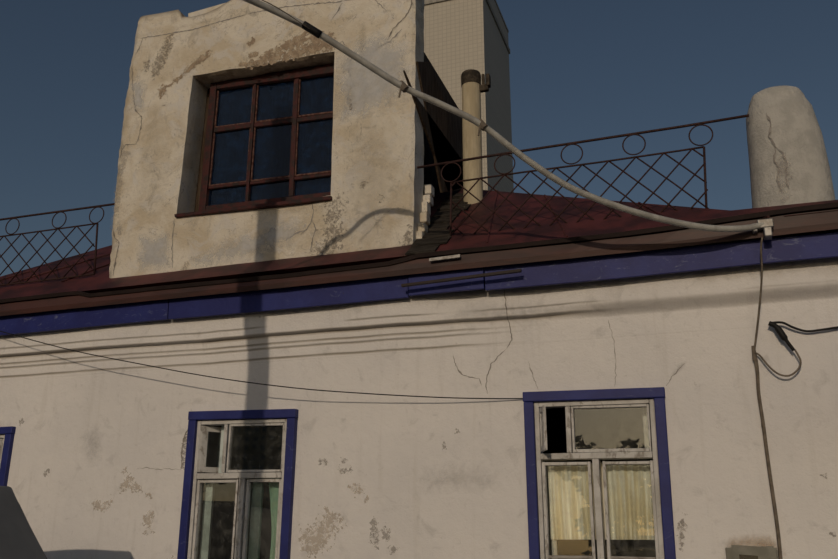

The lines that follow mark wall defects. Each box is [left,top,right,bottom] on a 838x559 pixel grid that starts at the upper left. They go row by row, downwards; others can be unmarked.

flaking render [157,49,211,99]
flaking render [239,31,336,70]
crack [766,113,789,190]
crack [453,290,512,394]
peeling [369,519,397,555]